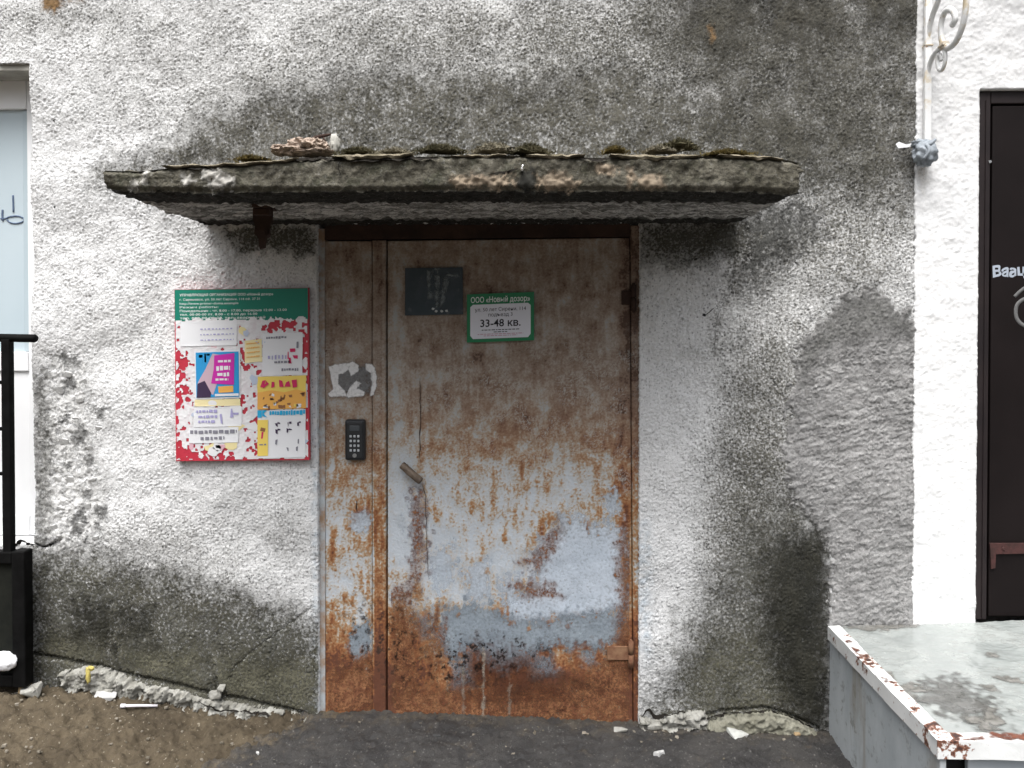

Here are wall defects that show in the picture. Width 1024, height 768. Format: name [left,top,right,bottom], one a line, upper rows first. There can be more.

damp [32,547,319,715]
spalling [57,664,307,722]
rust [328,608,373,711]
rust [391,483,630,721]
spalling [639,709,709,733]
damp [642,495,830,732]
rust [967,731,1024,740]